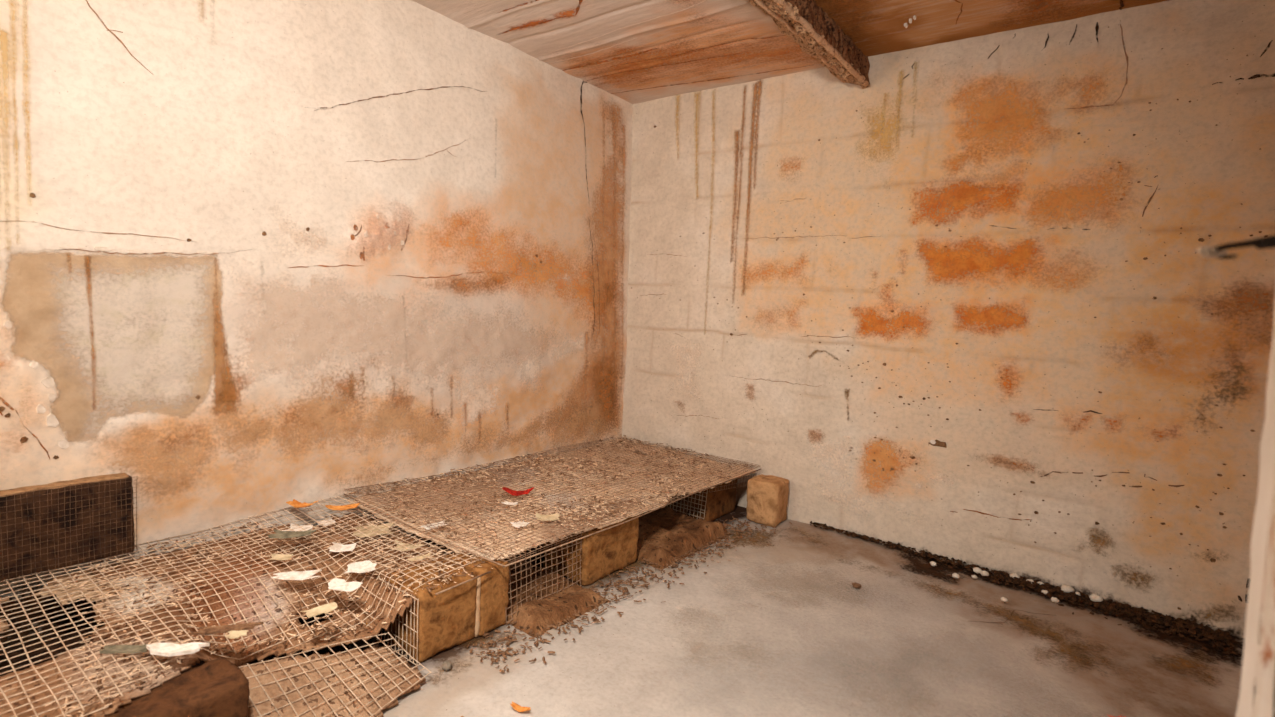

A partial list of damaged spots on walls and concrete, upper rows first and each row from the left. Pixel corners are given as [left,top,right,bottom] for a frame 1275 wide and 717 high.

crack [86,0,154,75]
corrosion [511,10,575,30]
spalling [749,0,870,89]
crack [1044,0,1128,109]
crack [304,86,484,111]
crack [348,138,470,162]
corrosion [912,154,1019,224]
flaking render [0,238,222,459]
damp [113,105,625,490]
corrosion [918,239,1040,281]
corrosion [956,305,1027,333]
damp [847,529,1244,685]